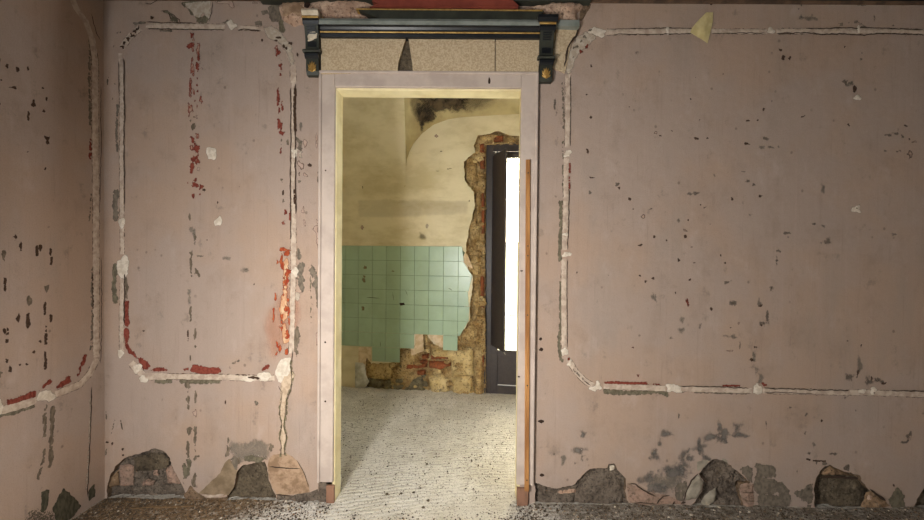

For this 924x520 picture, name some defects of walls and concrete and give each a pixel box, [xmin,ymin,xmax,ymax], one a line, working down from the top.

mould [416,98,468,129]
peeling [276,88,326,246]
peeling [188,213,200,277]
peeling [295,248,318,318]
flaking render [365,131,519,394]
peeling [3,285,87,405]
flaking render [106,278,318,501]
peeling [37,404,56,480]
flaking render [41,484,95,520]
mould [638,423,748,501]
flaking render [535,458,924,508]